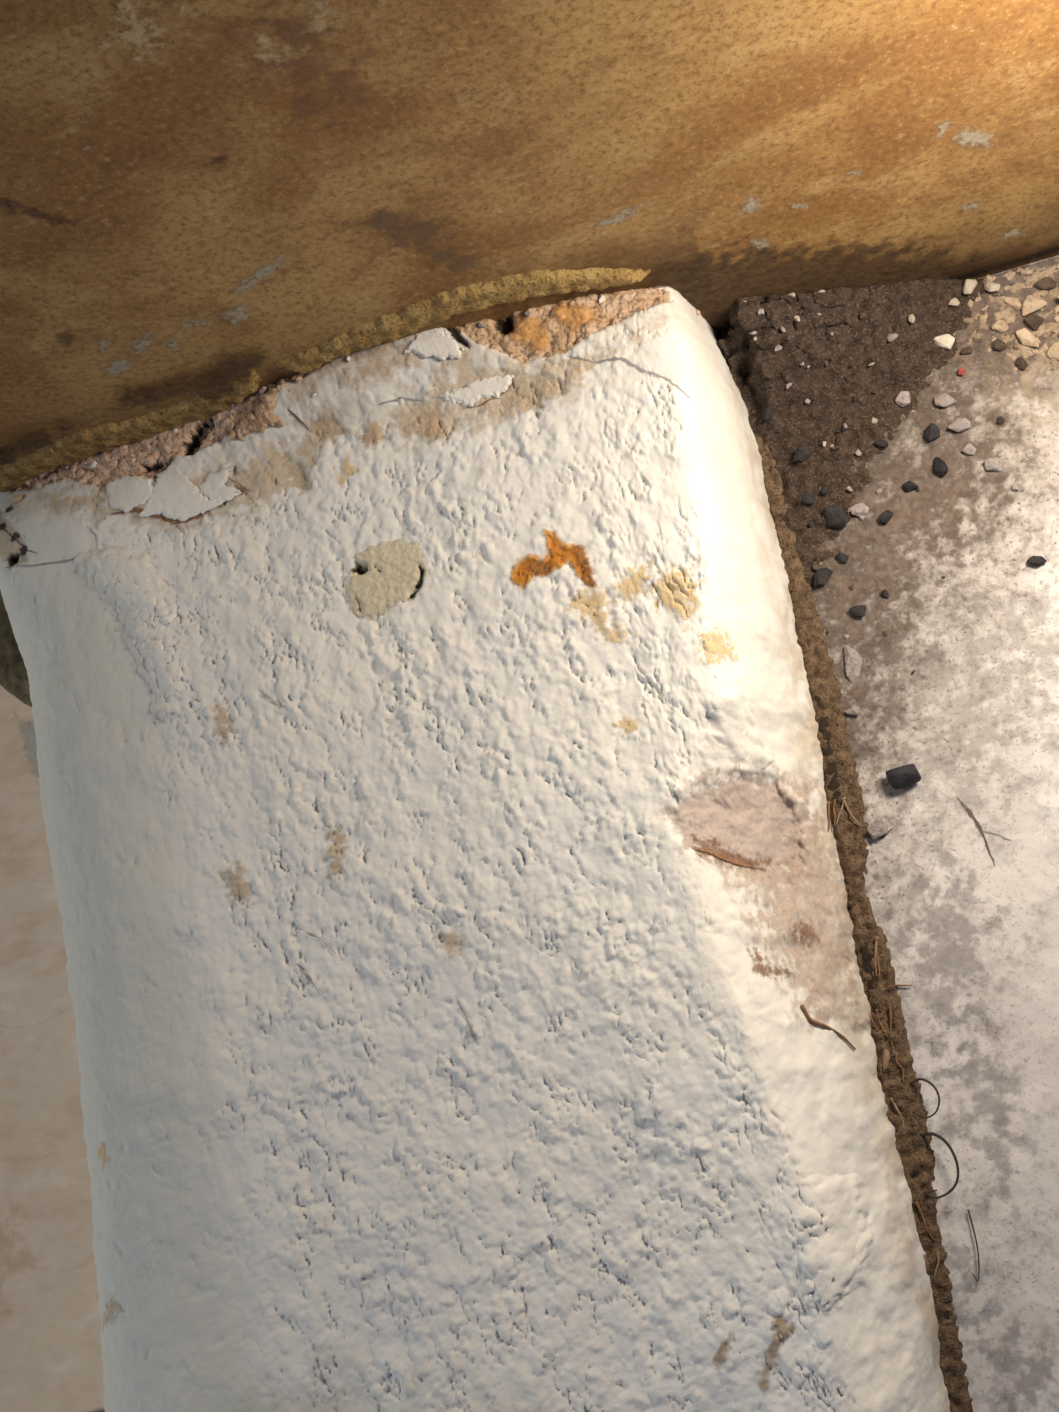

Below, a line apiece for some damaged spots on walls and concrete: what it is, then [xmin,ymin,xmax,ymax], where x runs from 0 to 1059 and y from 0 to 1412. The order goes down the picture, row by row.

crack [0,199,76,225]
leakage [116,353,269,410]
flaking render [404,287,675,443]
flaking render [360,421,383,448]
flaking render [0,363,326,569]
flaking render [338,459,357,485]
rust [511,529,734,664]